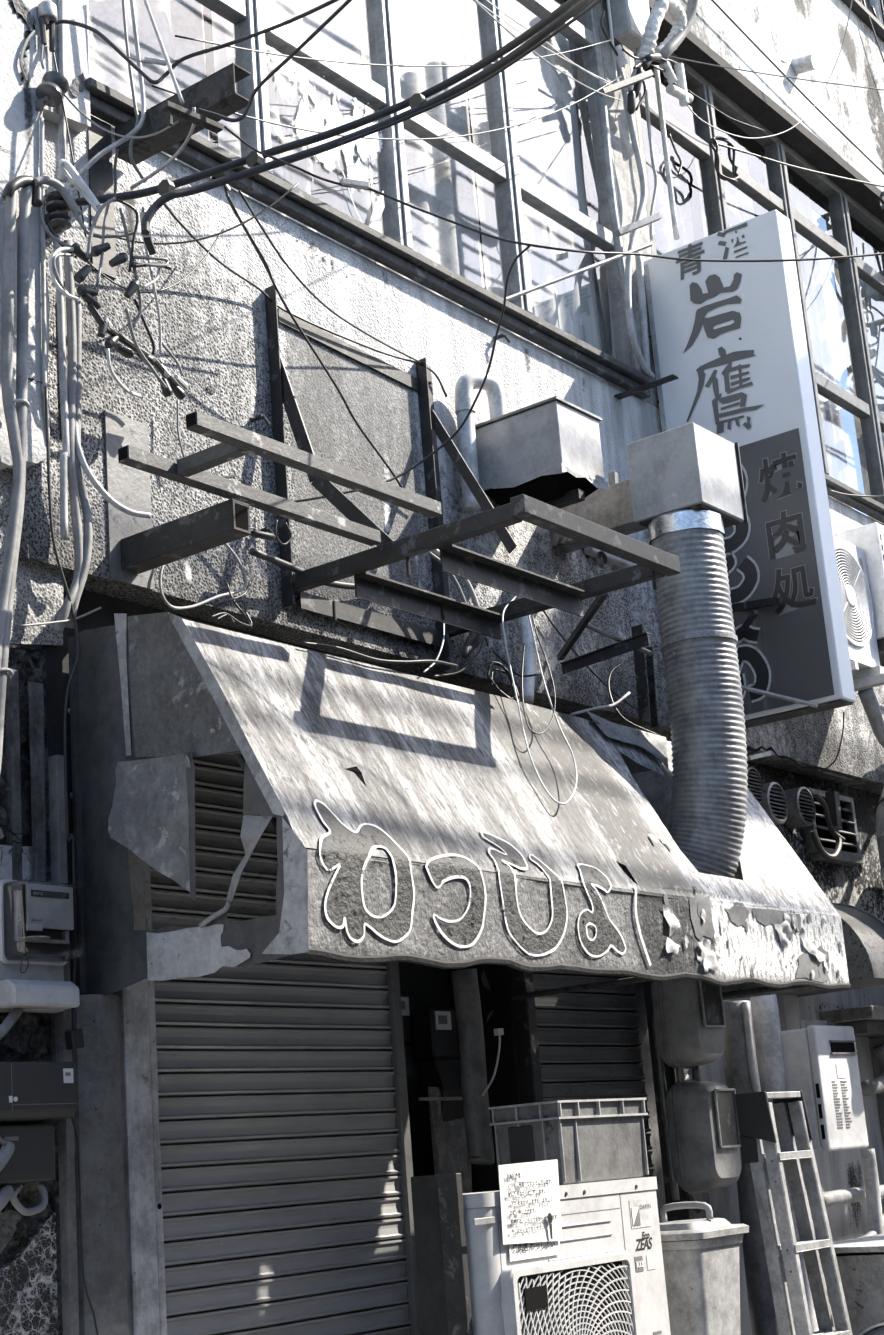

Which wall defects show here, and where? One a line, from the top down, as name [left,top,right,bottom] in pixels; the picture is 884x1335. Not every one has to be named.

leakage [795,0,812,19]
leakage [812,22,884,169]
peeling [663,886,842,982]